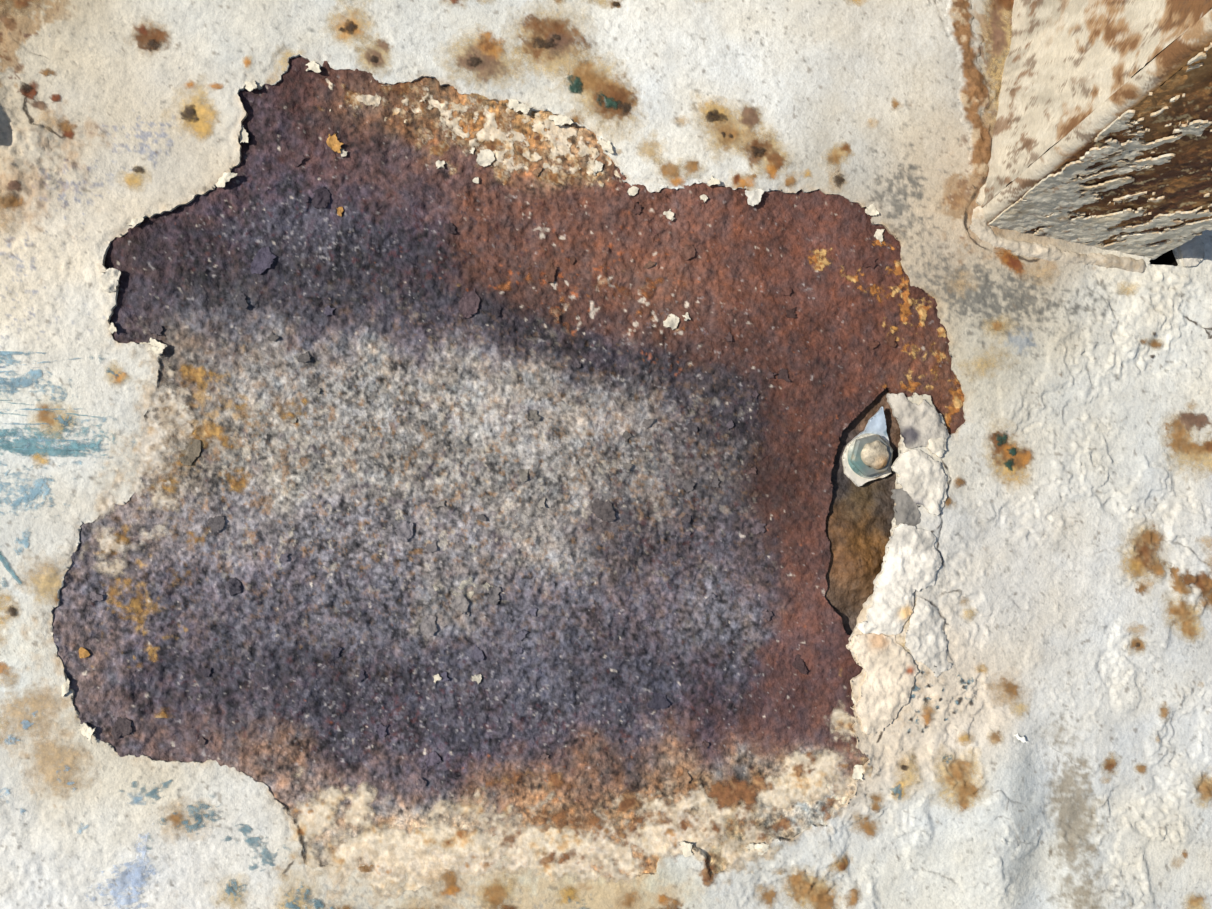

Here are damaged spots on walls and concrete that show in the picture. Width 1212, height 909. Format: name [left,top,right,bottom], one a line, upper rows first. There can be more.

corrosion [329,6,390,72]
corrosion [452,0,638,124]
corrosion [985,0,1014,106]
corrosion [20,69,76,139]
corrosion [181,82,222,138]
corrosion [640,142,700,186]
corrosion [701,101,810,190]
peeling [52,56,965,901]
corrosion [989,431,1032,483]
corrosion [1165,404,1212,471]
corrosion [1123,525,1212,640]
corrosion [854,759,917,836]